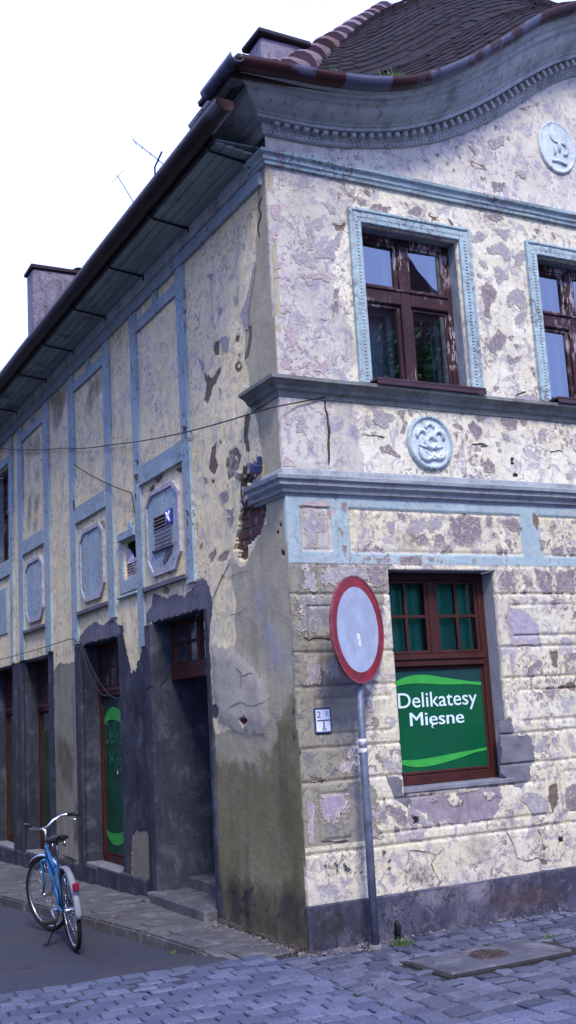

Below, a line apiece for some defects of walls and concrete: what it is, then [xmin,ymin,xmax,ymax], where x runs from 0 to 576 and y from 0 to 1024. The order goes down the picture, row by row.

crack [255,196,263,237]
peeling [404,202,454,225]
peeling [270,186,392,338]
peeling [471,211,537,378]
spalling [198,358,221,403]
crack [323,400,331,464]
peeling [380,444,401,457]
peeling [452,414,487,458]
peeling [481,417,528,474]
spalling [185,413,266,562]
spalling [372,702,576,870]
crack [407,849,444,882]